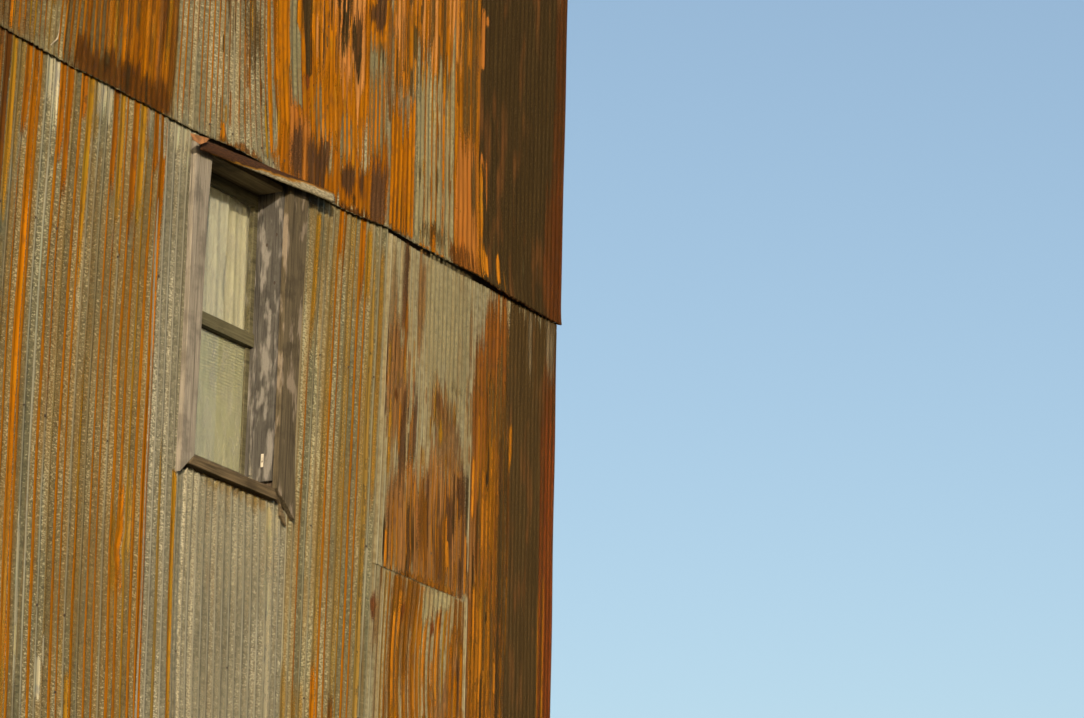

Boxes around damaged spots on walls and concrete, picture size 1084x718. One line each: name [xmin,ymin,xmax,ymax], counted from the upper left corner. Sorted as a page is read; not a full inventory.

rust [0,0,568,718]